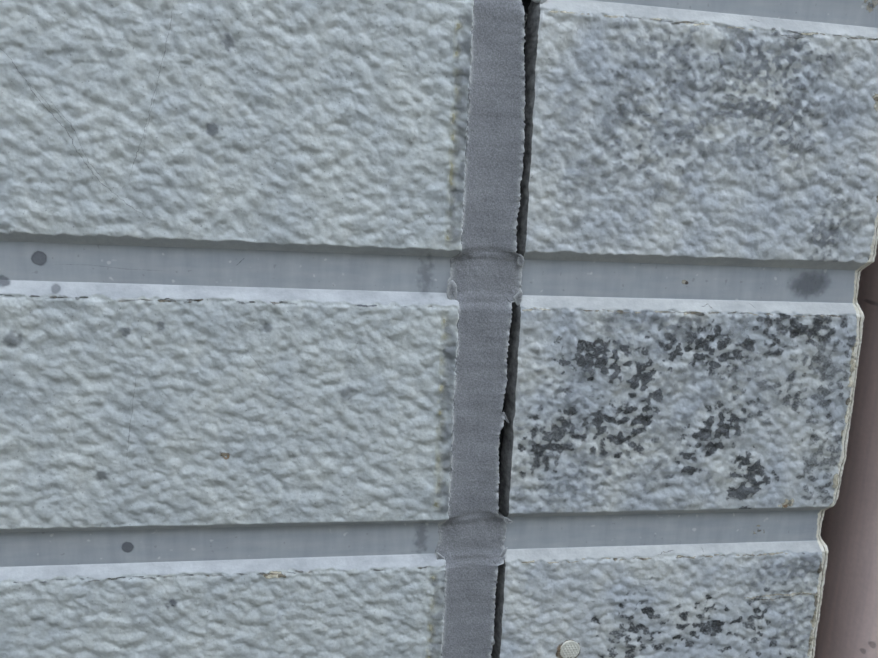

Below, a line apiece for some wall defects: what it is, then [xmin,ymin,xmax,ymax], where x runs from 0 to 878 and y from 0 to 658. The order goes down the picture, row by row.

crack [522,0,531,58]
water stain [518,313,856,509]
water stain [600,588,796,658]